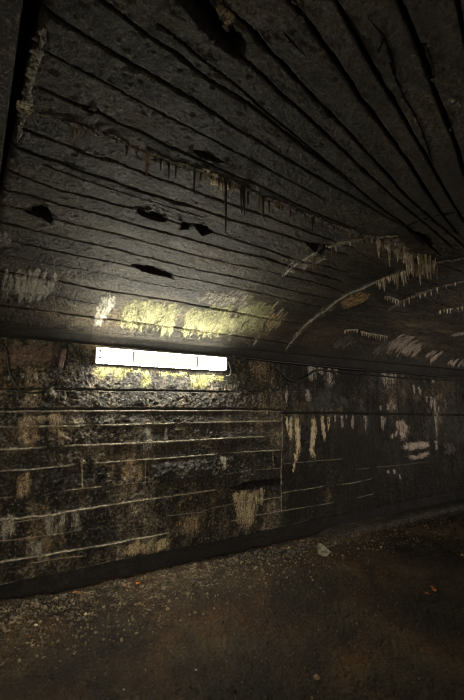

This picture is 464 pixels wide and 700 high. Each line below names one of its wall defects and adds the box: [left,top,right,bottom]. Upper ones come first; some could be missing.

spalling [26,204,59,224]
spalling [134,207,167,223]
spalling [177,220,212,236]
damp [16,100,464,352]
spalling [131,264,174,280]
damp [334,329,444,363]
damp [286,366,354,472]
damp [392,420,409,441]
damp [412,385,439,450]
damp [233,488,266,530]